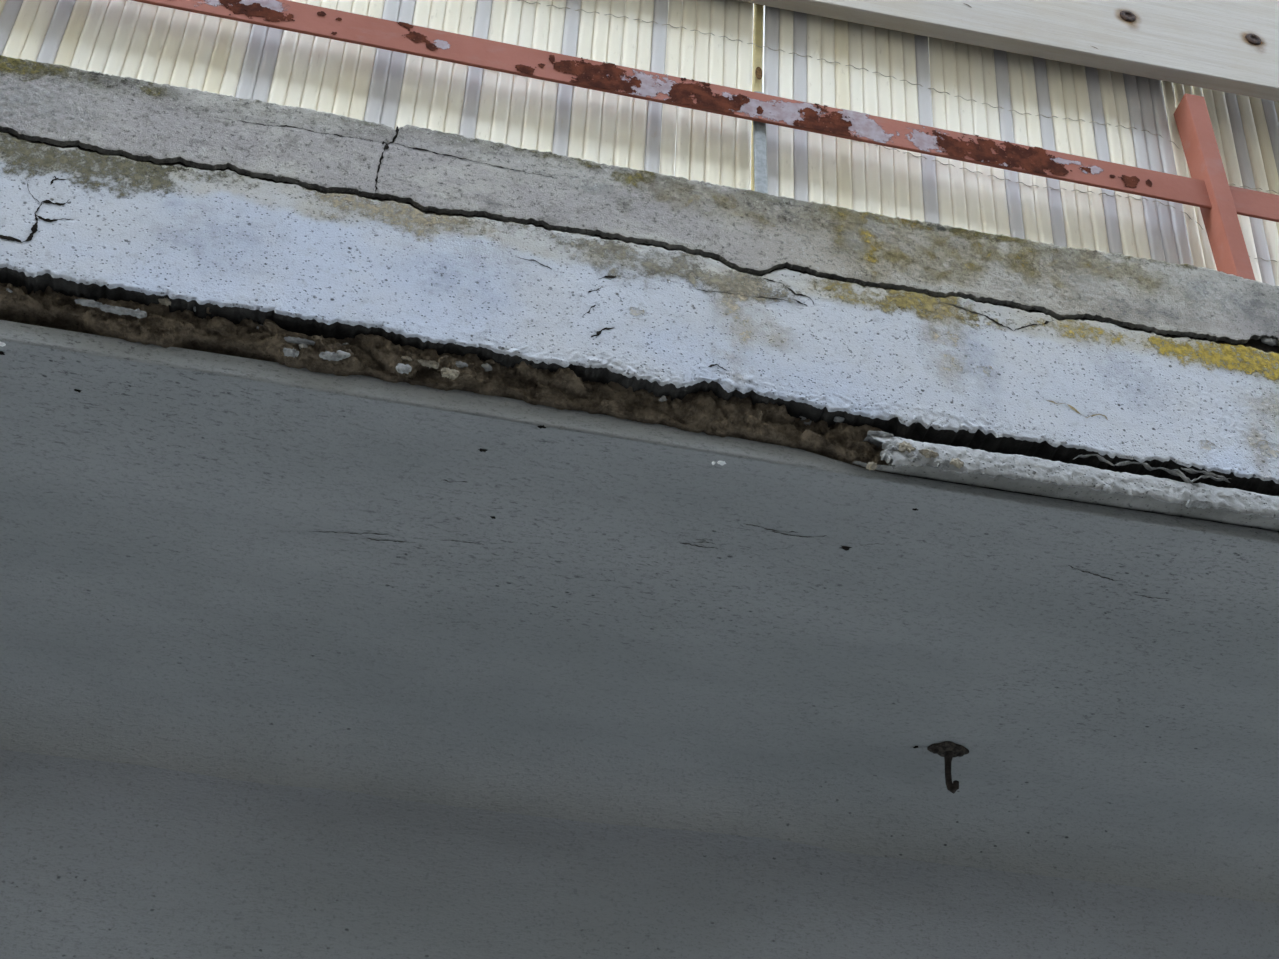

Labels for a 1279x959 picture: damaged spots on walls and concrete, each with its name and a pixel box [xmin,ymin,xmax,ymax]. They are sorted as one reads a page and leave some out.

rust [217,0,295,22]
rust [397,22,437,50]
rust [515,55,642,93]
rust [656,78,764,119]
rust [793,103,857,138]
rust [926,130,1091,175]
rust [1110,175,1152,188]
crack [0,117,1279,354]
spalling [0,283,964,476]